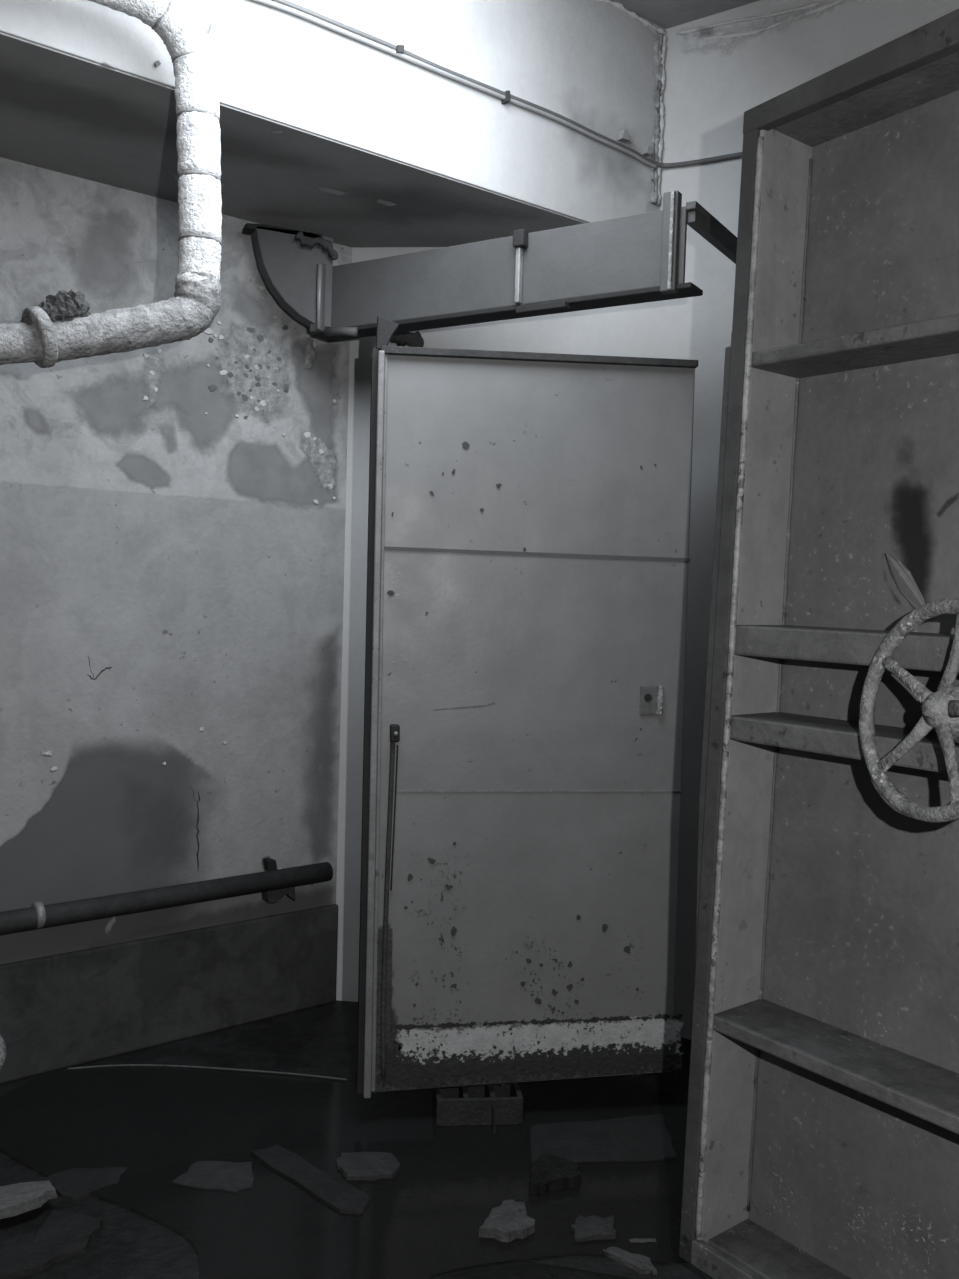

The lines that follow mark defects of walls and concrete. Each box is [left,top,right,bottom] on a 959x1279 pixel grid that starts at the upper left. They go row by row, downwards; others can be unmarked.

flaking render [143,348,164,405]
flaking render [204,316,289,422]
flaking render [301,432,336,504]